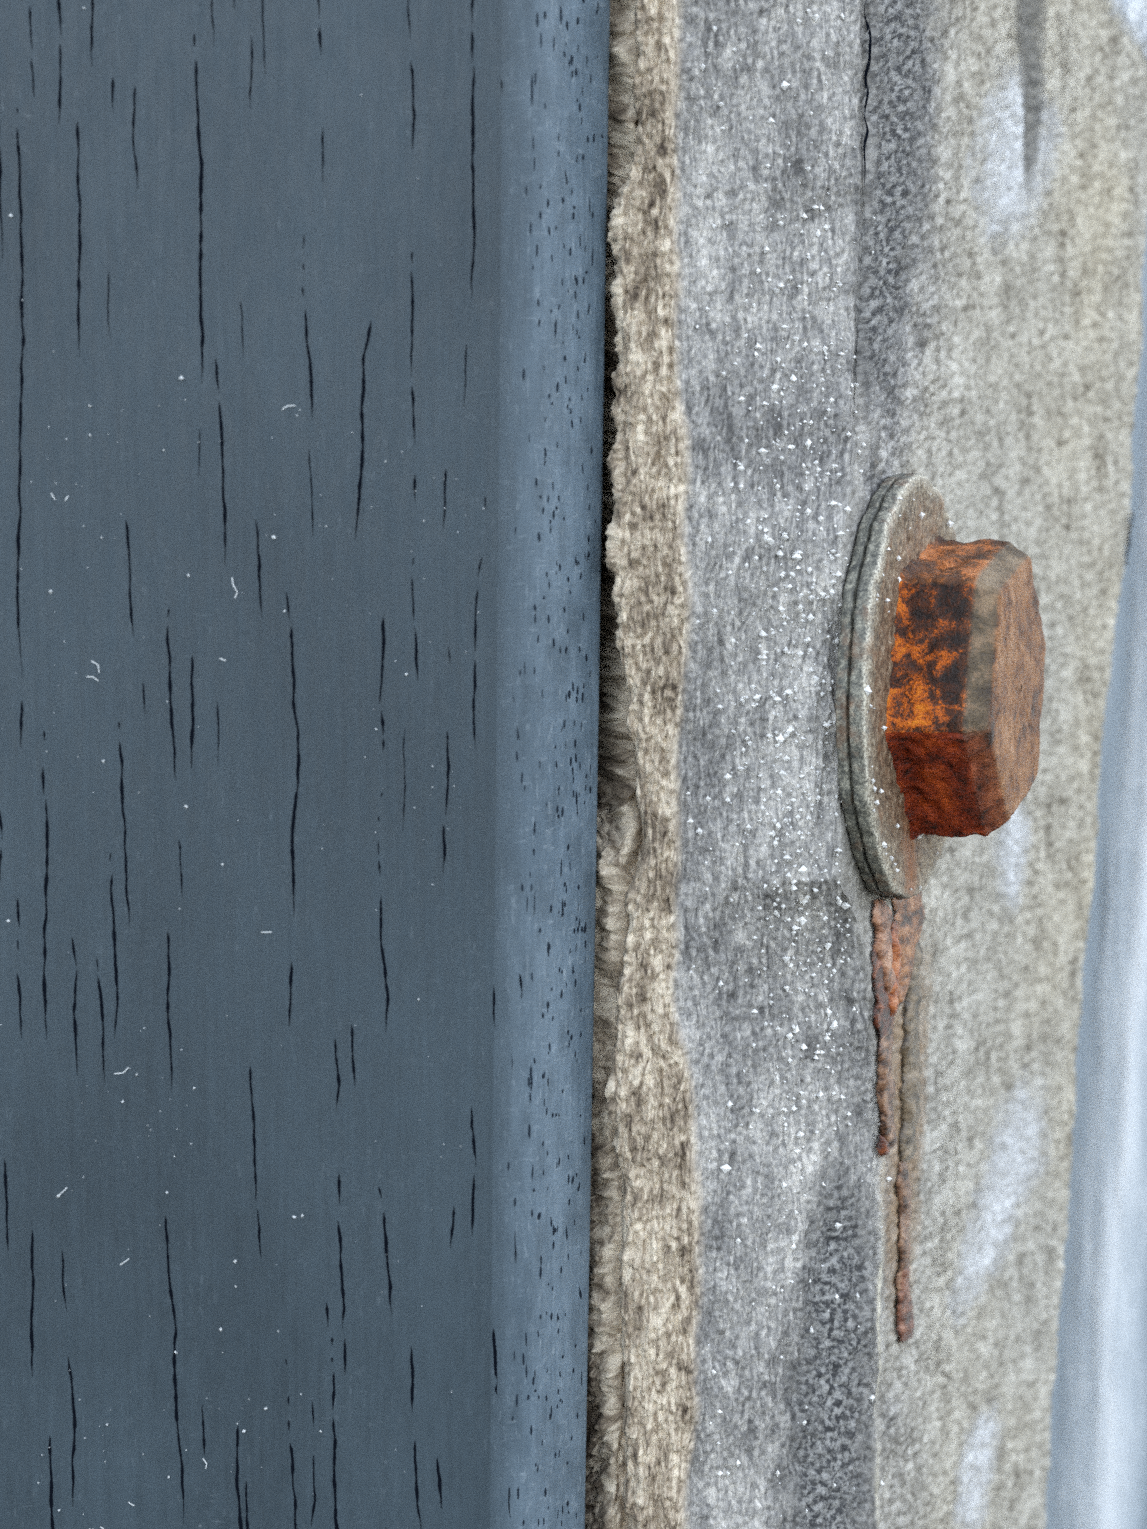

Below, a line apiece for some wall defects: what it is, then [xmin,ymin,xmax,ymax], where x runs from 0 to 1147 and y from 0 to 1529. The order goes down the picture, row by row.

crack [863,0,872,190]
corrosion [872,891,925,1343]
water stain [781,1142,875,1529]